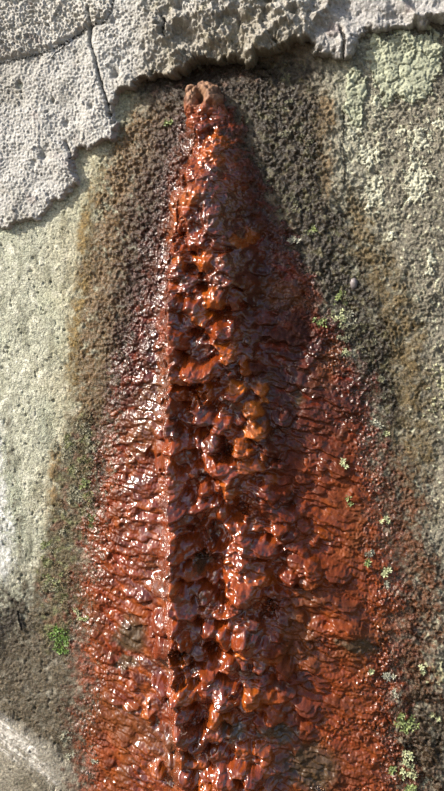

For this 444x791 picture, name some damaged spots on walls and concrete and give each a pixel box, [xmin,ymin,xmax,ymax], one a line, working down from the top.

crack [0,2,114,115]
flaking render [0,0,444,231]
corrosion [63,80,444,791]
damp [395,673,444,791]